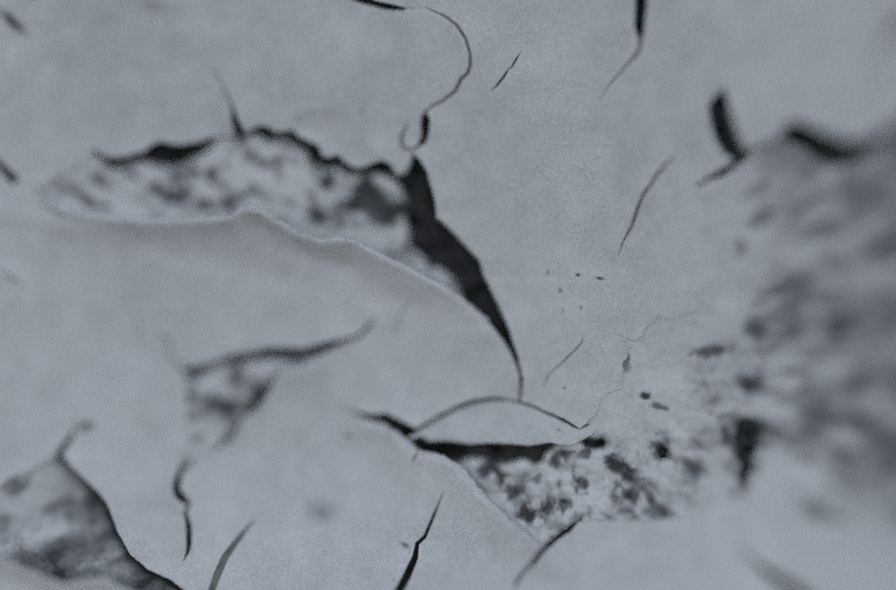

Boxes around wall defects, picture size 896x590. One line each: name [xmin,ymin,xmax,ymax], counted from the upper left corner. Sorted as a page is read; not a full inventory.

crack [491,52,521,91]
crack [600,0,647,100]
peeling [21,66,523,403]
crack [618,154,677,255]
crack [543,333,584,388]
peeling [329,87,896,590]
peeling [156,315,376,561]